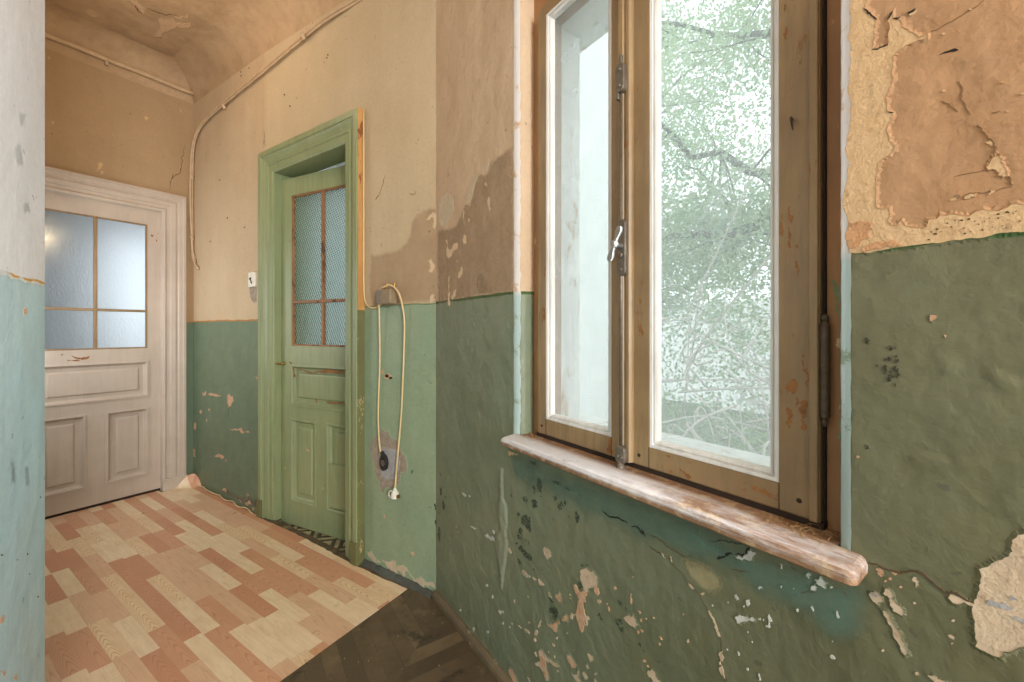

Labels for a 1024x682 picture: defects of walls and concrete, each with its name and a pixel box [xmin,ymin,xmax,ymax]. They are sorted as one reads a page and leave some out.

peeling [842,0,1024,256]
leakage [438,156,512,302]
peeling [193,391,234,431]
spalling [369,427,413,493]
spalling [367,550,436,589]
spalling [485,478,662,682]
crack [790,562,974,603]
spalling [944,526,1024,663]